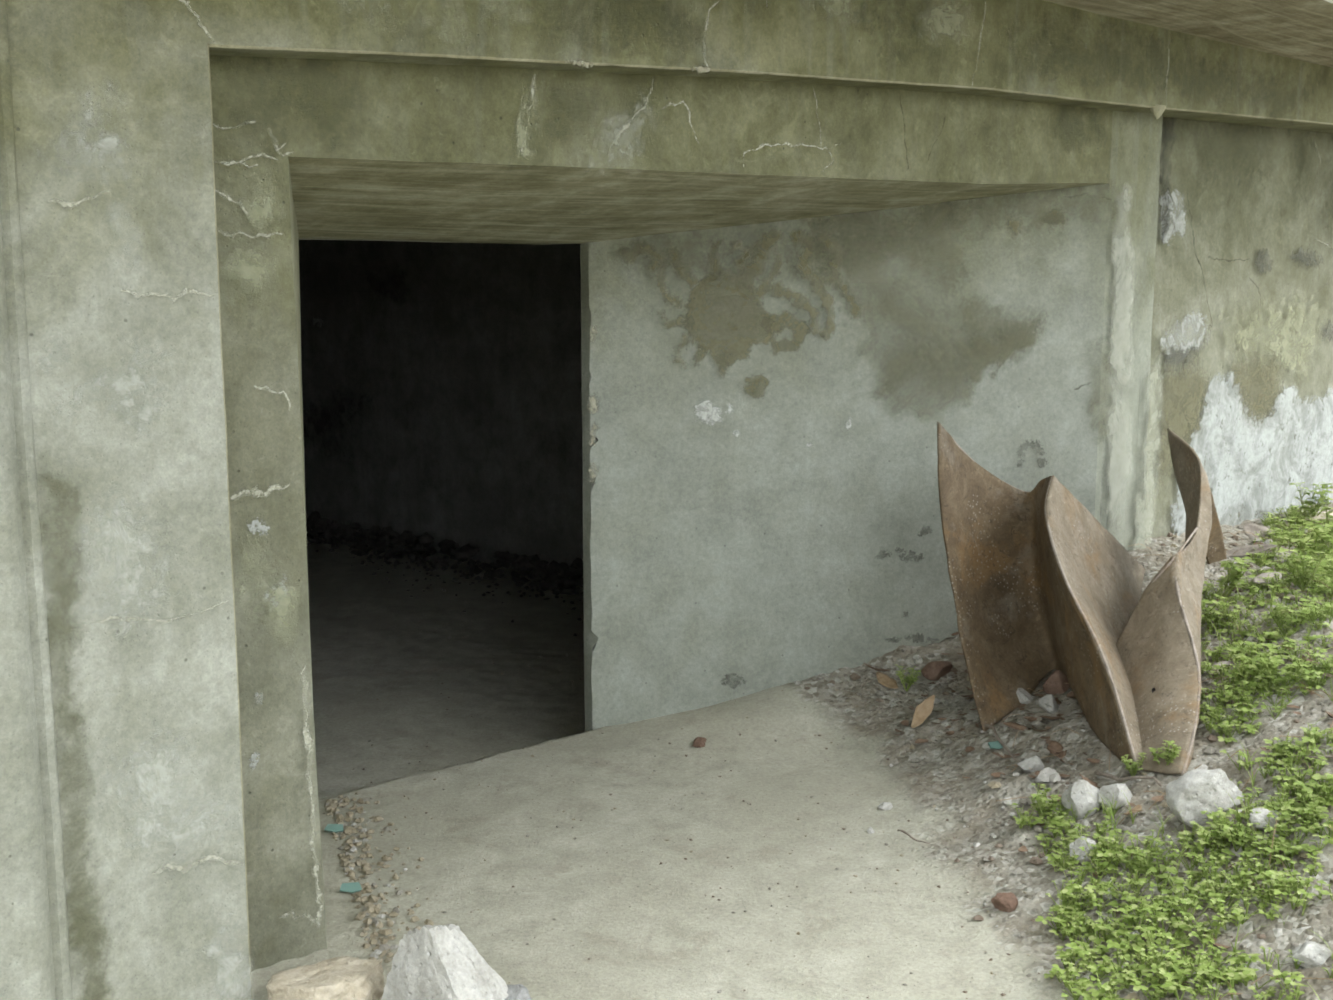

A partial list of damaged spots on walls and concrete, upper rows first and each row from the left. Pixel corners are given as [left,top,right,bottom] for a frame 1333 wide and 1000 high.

crack [180,0,211,38]
crack [611,91,699,147]
crack [743,88,834,172]
crack [213,121,289,239]
peeling [1159,189,1187,246]
leakage [622,229,861,376]
crack [254,385,291,411]
spalling [695,400,732,426]
leakage [744,374,769,398]
peeling [1134,302,1333,549]
crack [230,444,311,500]
crack [284,666,323,929]